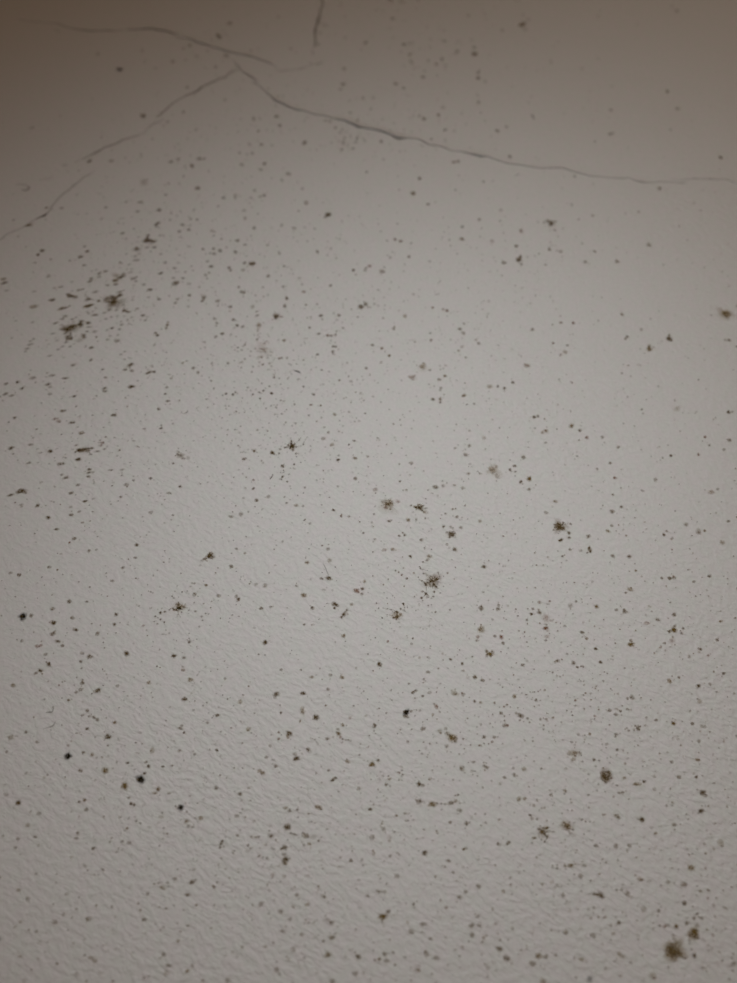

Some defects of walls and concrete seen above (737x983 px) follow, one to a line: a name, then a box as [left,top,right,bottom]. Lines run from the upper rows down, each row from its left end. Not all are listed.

crack [232,55,737,184]
leakage [31,191,366,521]
leakage [5,365,130,530]
leakage [323,475,462,619]
leakage [658,902,707,958]